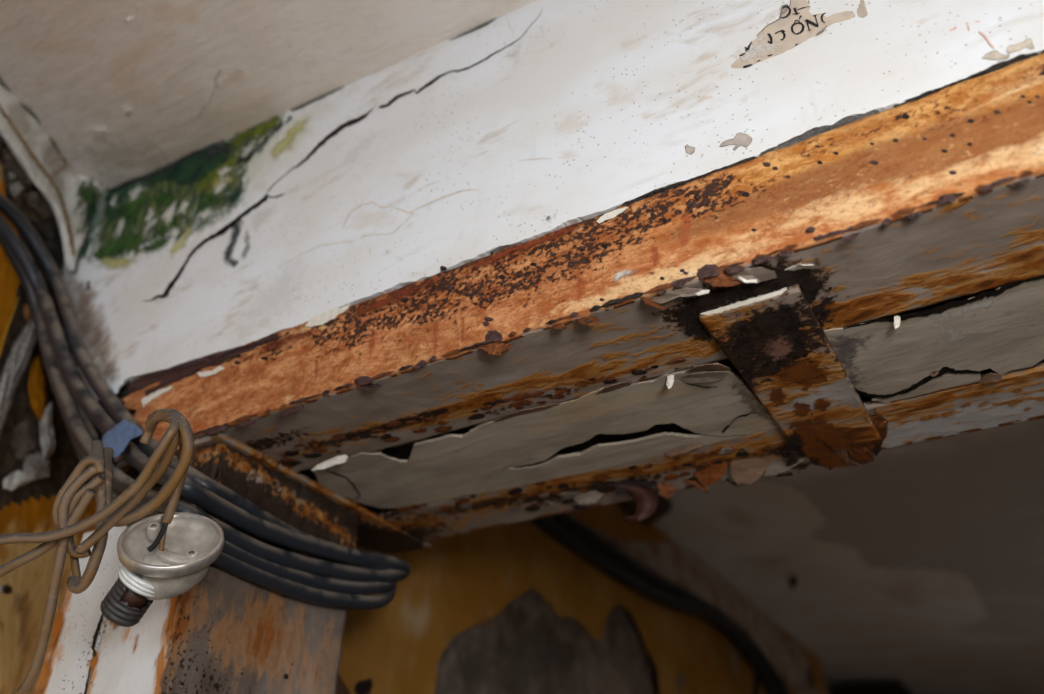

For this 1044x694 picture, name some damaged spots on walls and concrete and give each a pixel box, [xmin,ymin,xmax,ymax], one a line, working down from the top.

water stain [185,42,277,113]
peeling [731,0,868,68]
spalling [0,135,64,275]
water stain [43,65,393,400]
crack [145,9,543,301]
water stain [331,192,417,247]
spalling [616,109,880,208]
corrosion [805,170,1033,242]
crack [844,276,1044,329]
corrosion [179,317,531,440]
corrosion [491,244,888,522]
crack [855,367,983,402]